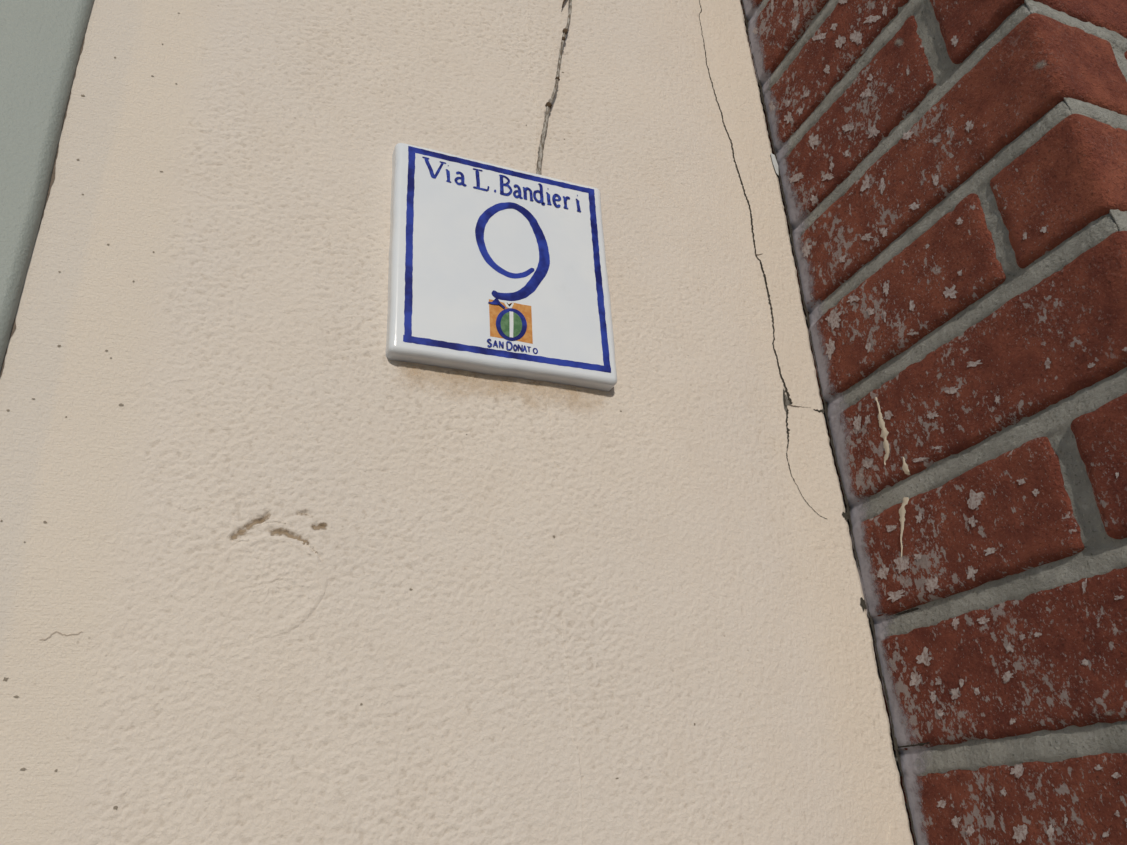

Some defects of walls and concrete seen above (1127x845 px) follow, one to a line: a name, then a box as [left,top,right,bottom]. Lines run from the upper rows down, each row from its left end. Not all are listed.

crack [699,0,929,845]
water stain [875,397,890,465]
spalling [231,513,327,555]